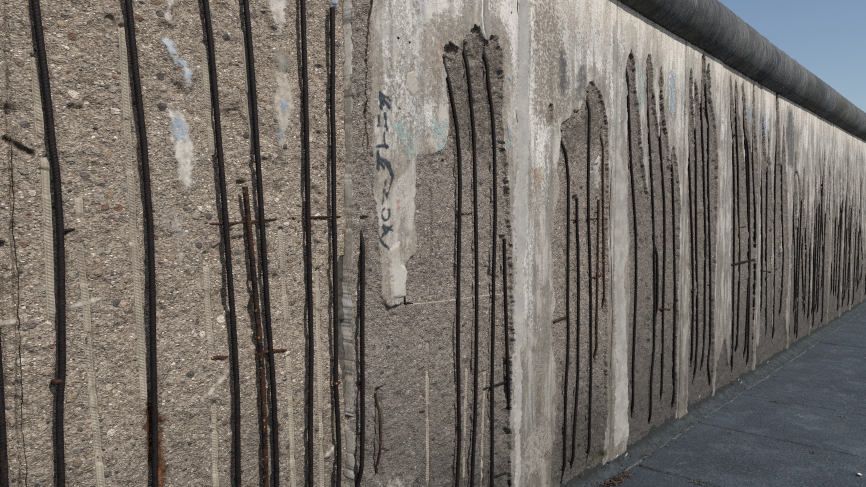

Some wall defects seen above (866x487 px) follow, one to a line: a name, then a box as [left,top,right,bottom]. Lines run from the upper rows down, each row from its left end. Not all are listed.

crack [10,138,28,487]
spalling [5,138,35,156]
corrosion [143,391,168,486]
spalling [348,0,515,487]
spalling [546,81,610,487]
spalling [625,49,866,445]